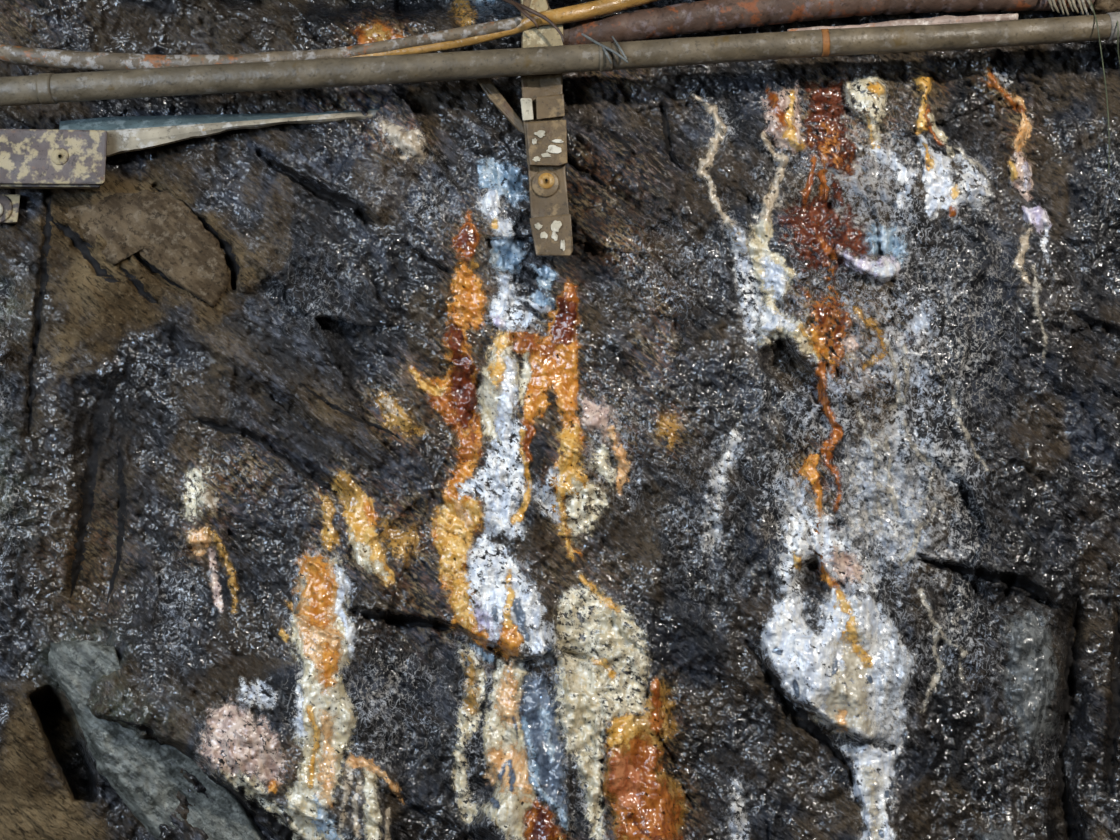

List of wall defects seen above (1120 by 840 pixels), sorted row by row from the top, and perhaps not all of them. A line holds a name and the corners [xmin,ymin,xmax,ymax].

rust [319,212,499,655]
rust [523,798,565,840]
rust [506,282,589,561]
damp [452,158,652,840]
rust [603,678,687,840]
rust [657,415,681,449]
rust [778,82,889,573]
damp [760,429,942,840]
crack [918,559,1079,840]
crack [1081,316,1120,335]
crack [1103,613,1120,792]